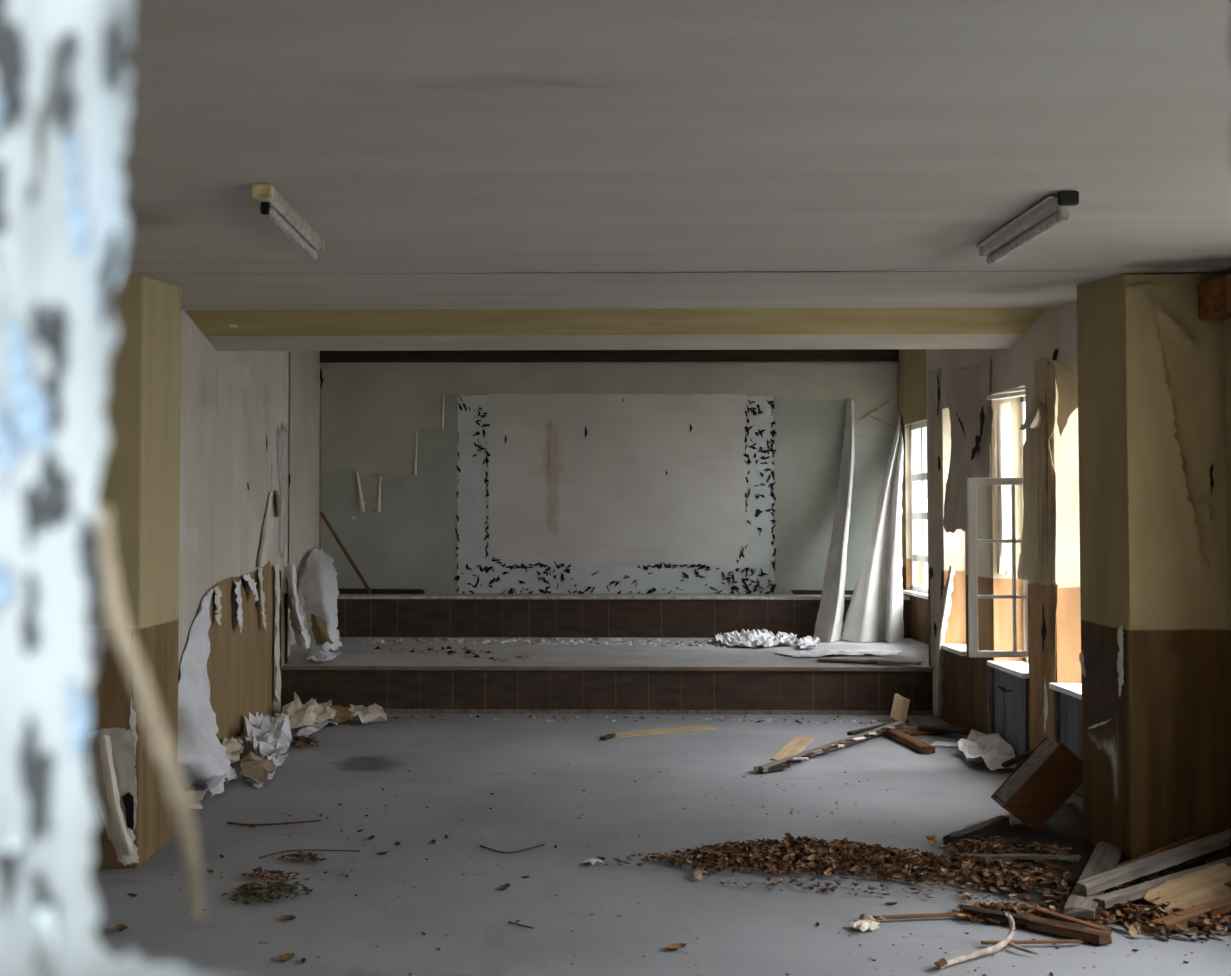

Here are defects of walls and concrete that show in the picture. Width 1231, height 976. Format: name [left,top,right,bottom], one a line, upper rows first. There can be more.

peeling [0,0,27,137]
peeling [52,30,88,257]
peeling [103,4,125,108]
peeling [98,227,118,326]
peeling [0,300,104,676]
peeling [177,490,343,787]
peeling [928,368,943,717]
peeling [1017,359,1078,751]
peeling [0,709,60,948]
peeling [67,680,139,866]